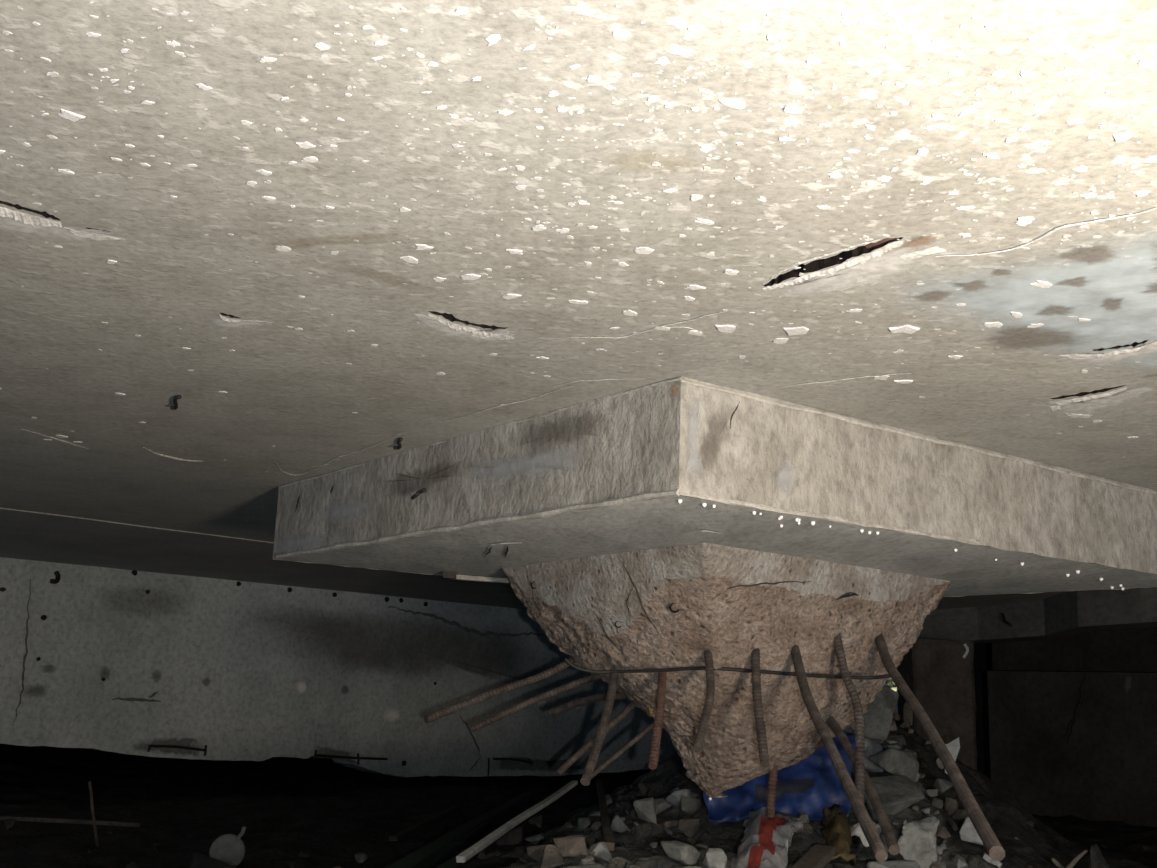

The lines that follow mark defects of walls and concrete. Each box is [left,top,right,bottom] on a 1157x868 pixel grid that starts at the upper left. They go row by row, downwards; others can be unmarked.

spalling [0,201,125,248]
spalling [762,191,1157,293]
spalling [413,311,513,356]
peeling [773,326,809,344]
peeling [889,325,920,334]
peeling [919,240,1157,373]
spalling [1048,385,1153,423]
crack [0,579,31,723]
spalling [693,649,715,752]
spalling [751,648,778,817]
spalling [791,633,900,862]
spalling [875,633,1005,861]